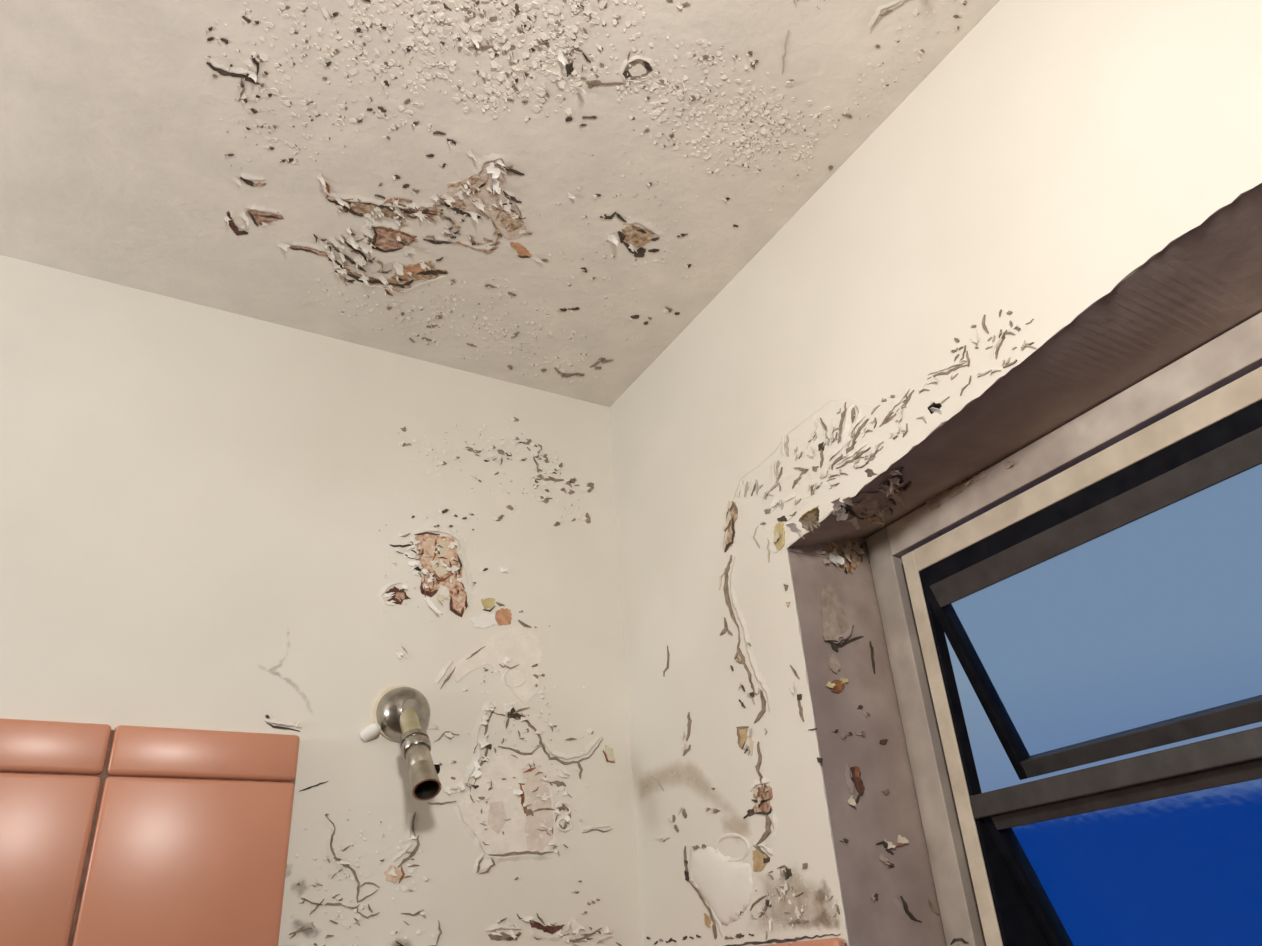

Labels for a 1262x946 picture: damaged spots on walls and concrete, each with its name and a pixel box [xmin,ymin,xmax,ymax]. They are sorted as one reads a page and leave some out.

peeling [205,0,967,384]
peeling [927,402,942,415]
peeling [720,467,912,574]
flaking render [377,417,603,883]
crack [662,646,670,677]
crack [719,555,823,764]
crack [493,702,615,785]
crack [680,712,692,756]
flaking render [844,764,865,806]
crack [290,781,435,946]
crack [684,845,724,939]
peeling [876,835,909,868]